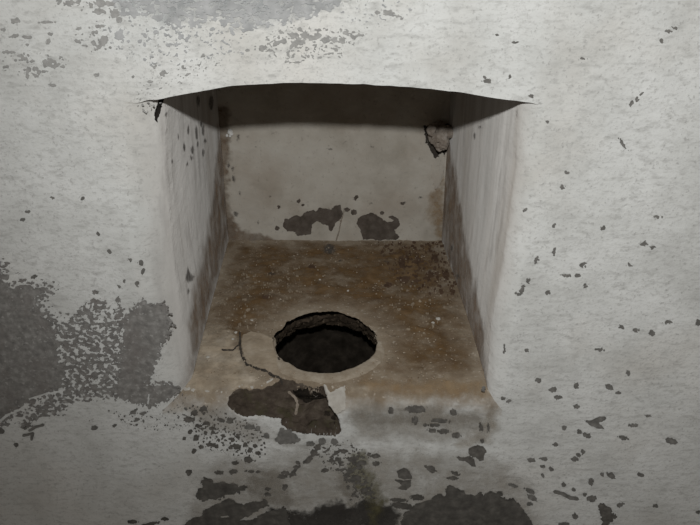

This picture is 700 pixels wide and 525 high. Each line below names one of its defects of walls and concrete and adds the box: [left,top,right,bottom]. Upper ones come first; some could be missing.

peeling [56,0,412,113]
spalling [275,195,458,319]
peeling [0,258,382,525]
crack [222,332,283,385]
water stain [185,243,467,395]
spalling [577,416,606,438]
peeling [390,468,537,525]
spalling [553,472,625,525]